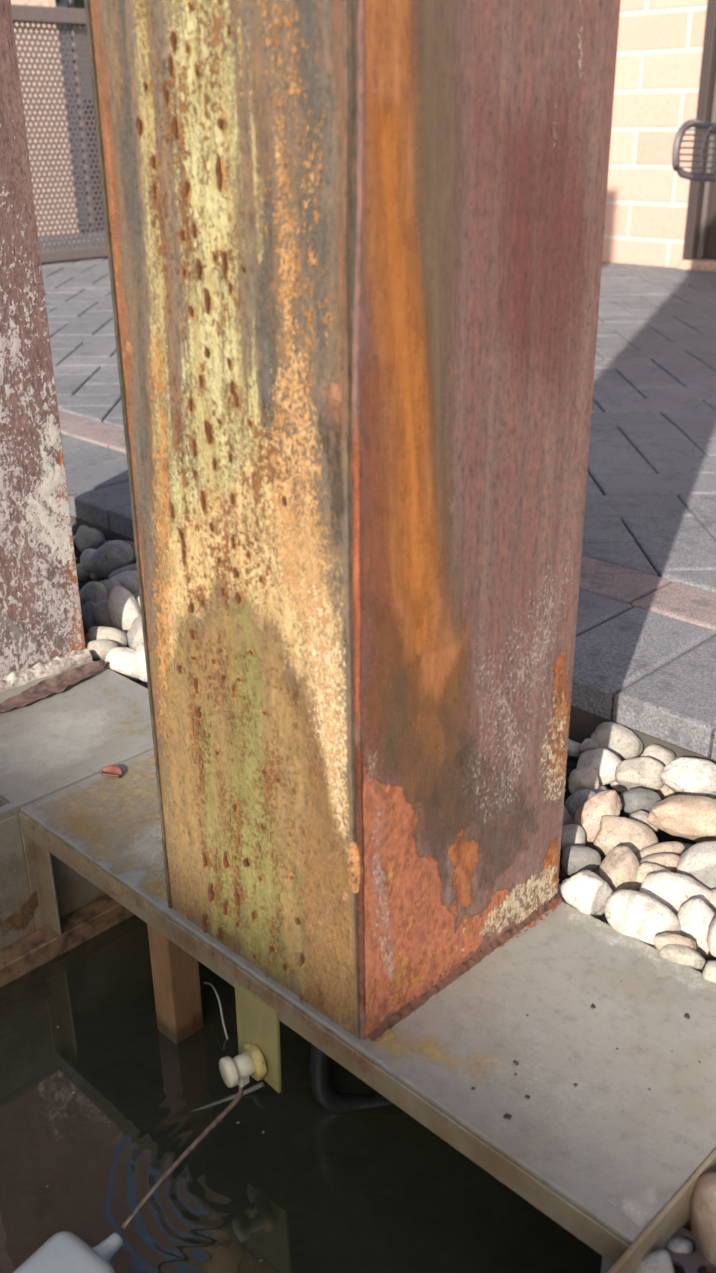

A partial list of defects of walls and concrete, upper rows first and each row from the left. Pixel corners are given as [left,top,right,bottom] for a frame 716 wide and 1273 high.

rust [92,0,131,434]
rust [59,450,85,651]
rust [134,0,305,977]
rust [551,650,571,784]
rust [484,837,562,957]